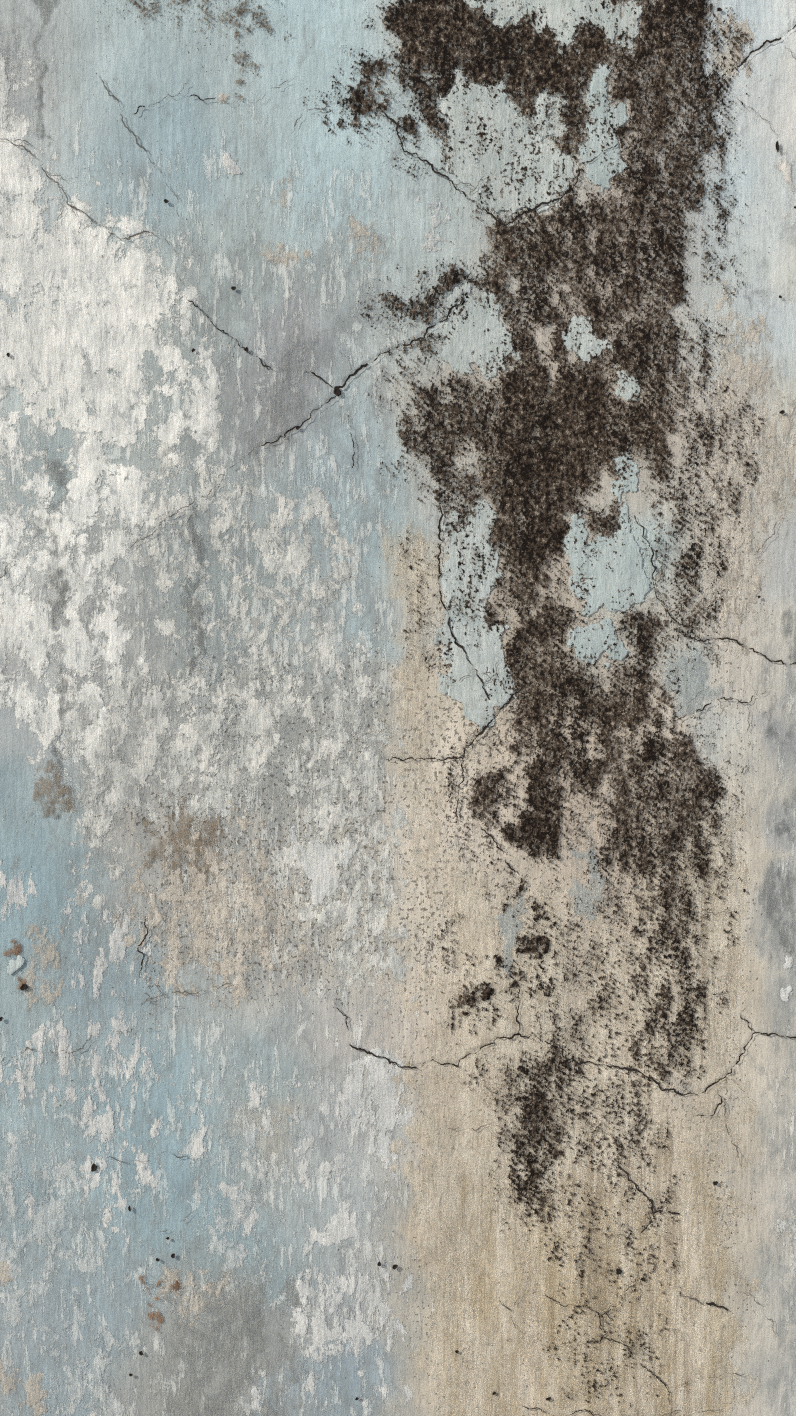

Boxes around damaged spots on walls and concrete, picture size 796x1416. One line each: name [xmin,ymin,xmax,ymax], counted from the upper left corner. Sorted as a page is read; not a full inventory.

crack [0,76,288,368]
crack [117,294,464,561]
damp [303,0,769,1416]
crack [551,515,796,748]
crack [334,984,796,1167]